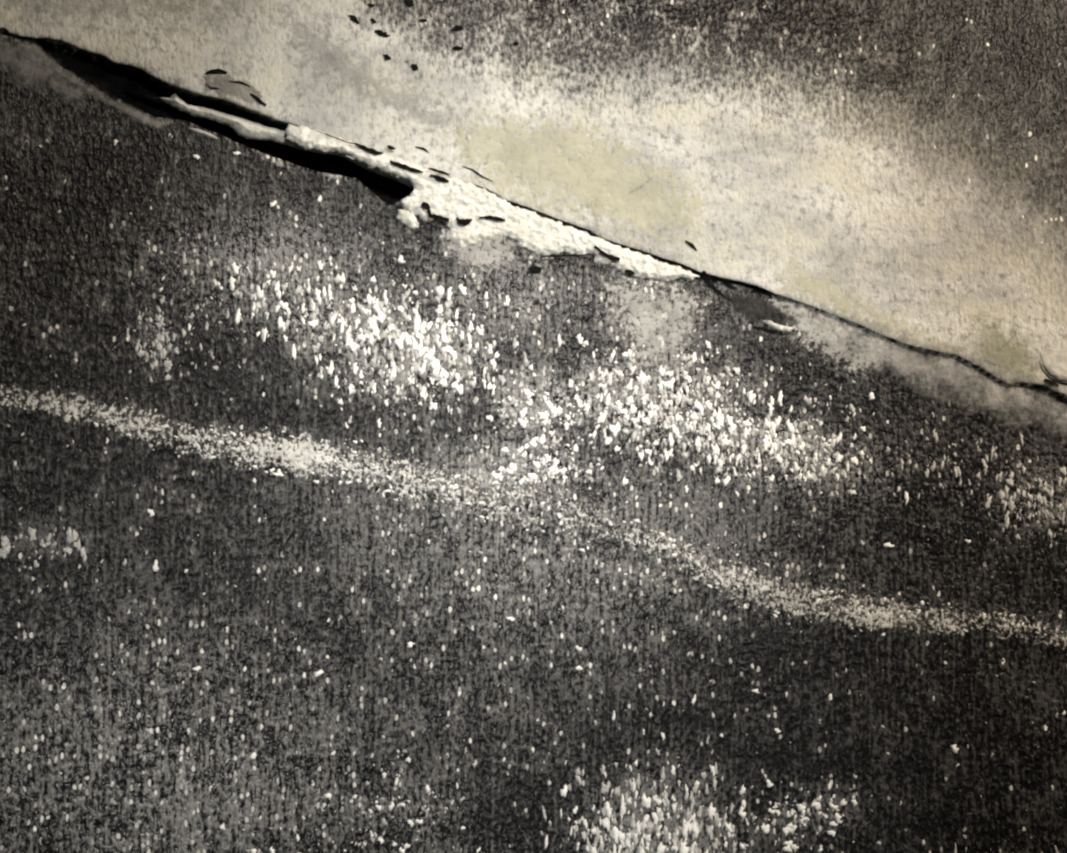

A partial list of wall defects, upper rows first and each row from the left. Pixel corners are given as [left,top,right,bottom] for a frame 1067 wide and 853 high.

peeling [188,128,220,140]
spalling [204,69,267,106]
spalling [285,124,700,282]
crack [316,130,1067,404]